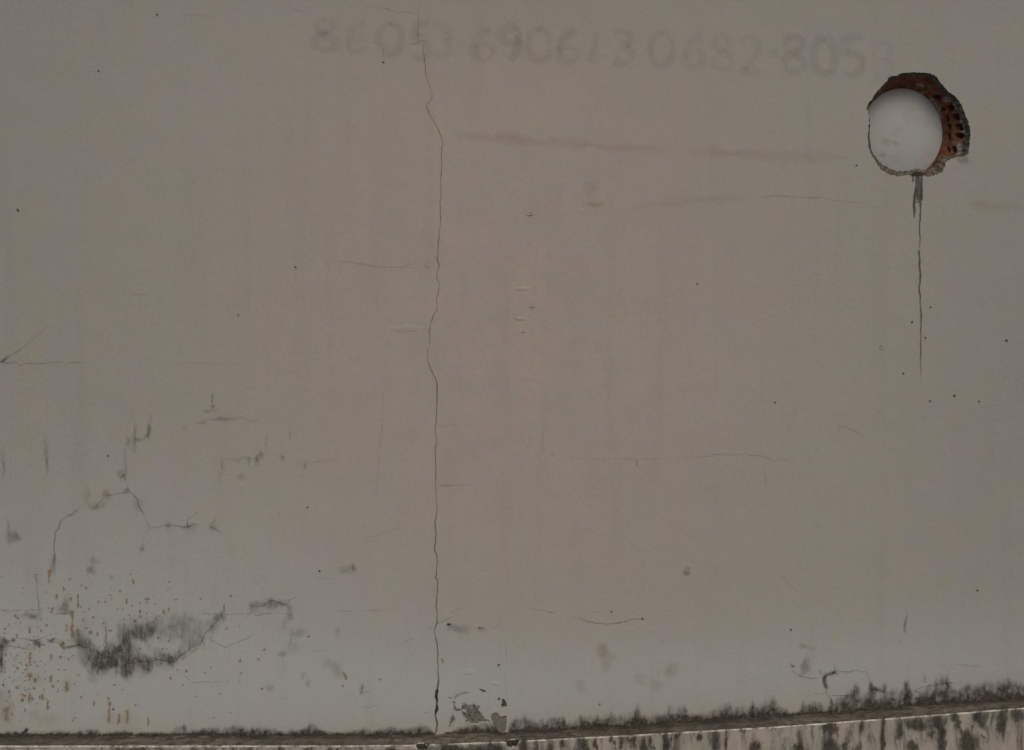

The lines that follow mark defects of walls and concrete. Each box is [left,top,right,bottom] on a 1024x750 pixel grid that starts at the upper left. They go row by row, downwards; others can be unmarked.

spalling [867,72,971,177]
corrosion [0,578,177,719]
damp [78,624,174,677]
crack [432,505,440,733]
peeling [448,697,519,746]
damp [0,681,1024,750]